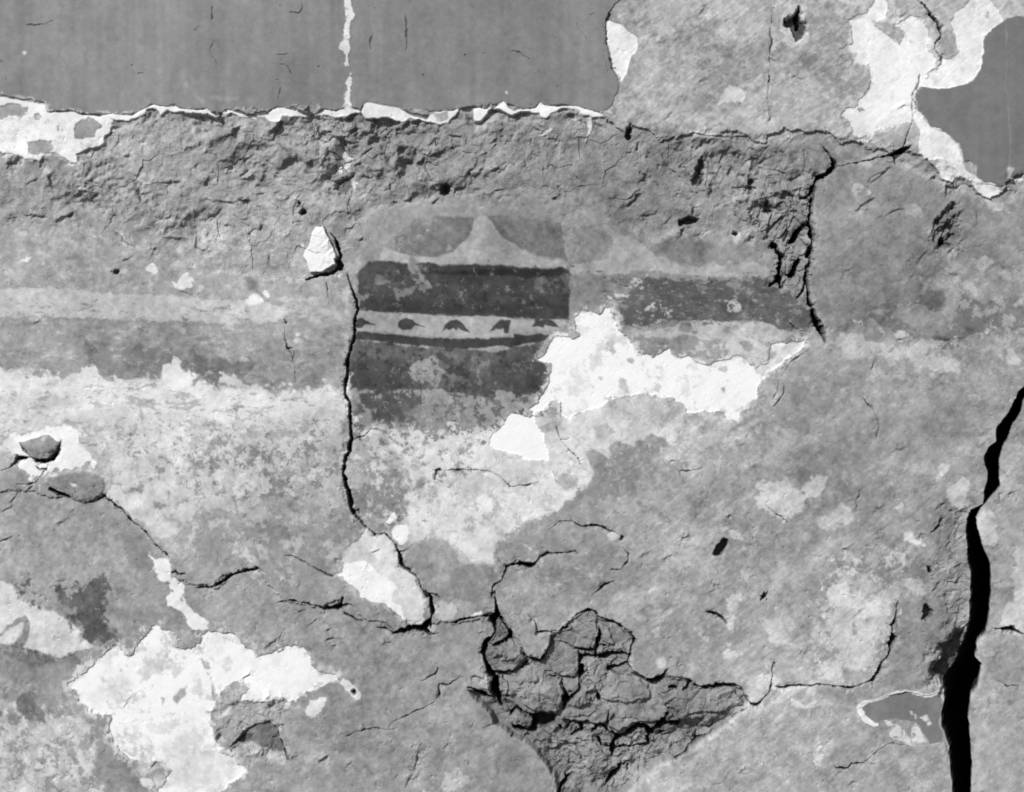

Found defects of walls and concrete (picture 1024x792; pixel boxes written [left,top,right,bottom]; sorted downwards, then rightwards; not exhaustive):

spalling [0,0,1024,306]
peeling [68,624,362,792]
peeling [0,265,806,624]
crack [1,233,906,788]
spalling [471,611,748,792]
crack [930,387,1024,792]